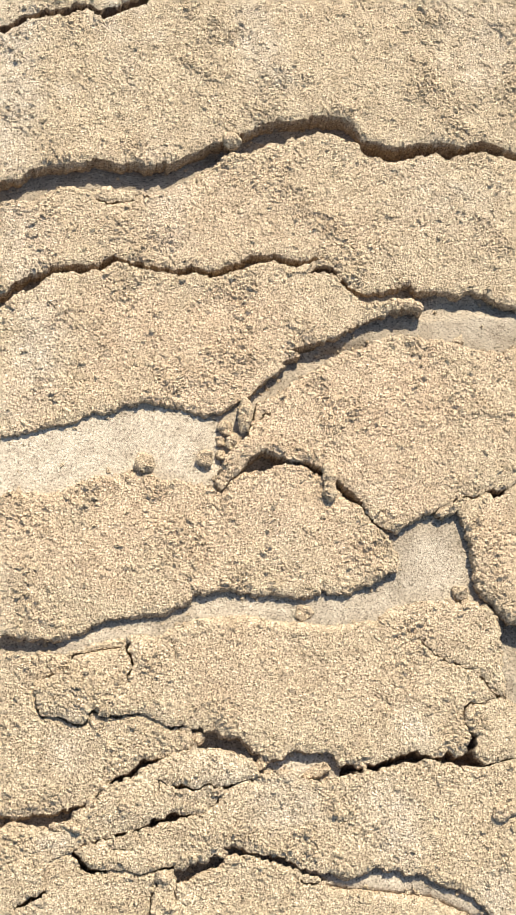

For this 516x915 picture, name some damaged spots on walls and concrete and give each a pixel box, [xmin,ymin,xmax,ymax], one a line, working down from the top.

crack [0,0,150,34]
crack [0,127,414,205]
crack [0,268,516,496]
crack [0,484,516,915]